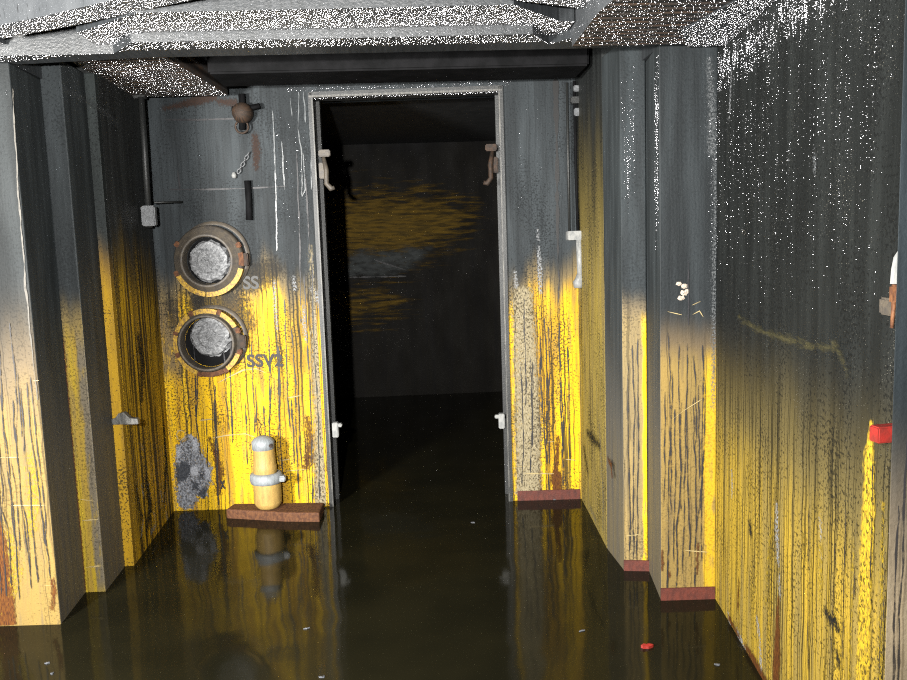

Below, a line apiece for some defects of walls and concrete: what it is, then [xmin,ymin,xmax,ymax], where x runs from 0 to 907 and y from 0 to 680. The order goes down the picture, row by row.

flaking render [173,434,214,510]
corrosion [0,521,17,626]
corrosion [49,578,57,611]